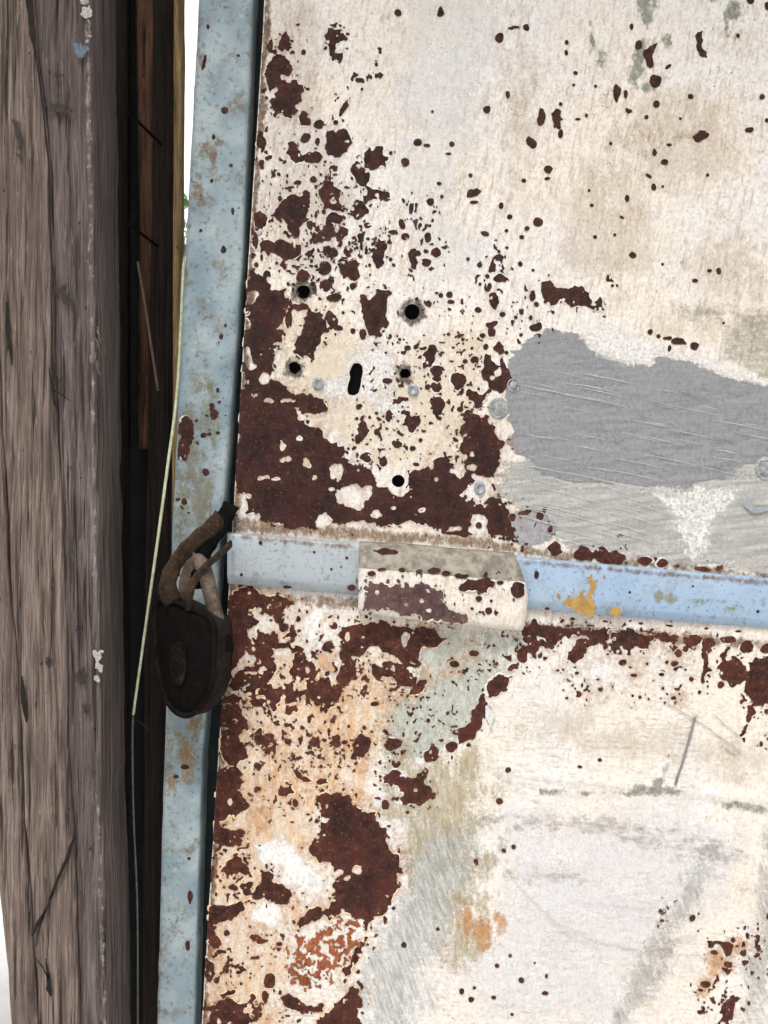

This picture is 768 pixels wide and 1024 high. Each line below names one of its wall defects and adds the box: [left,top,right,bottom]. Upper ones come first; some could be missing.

rust [175,22,731,574]
rust [202,567,768,1024]